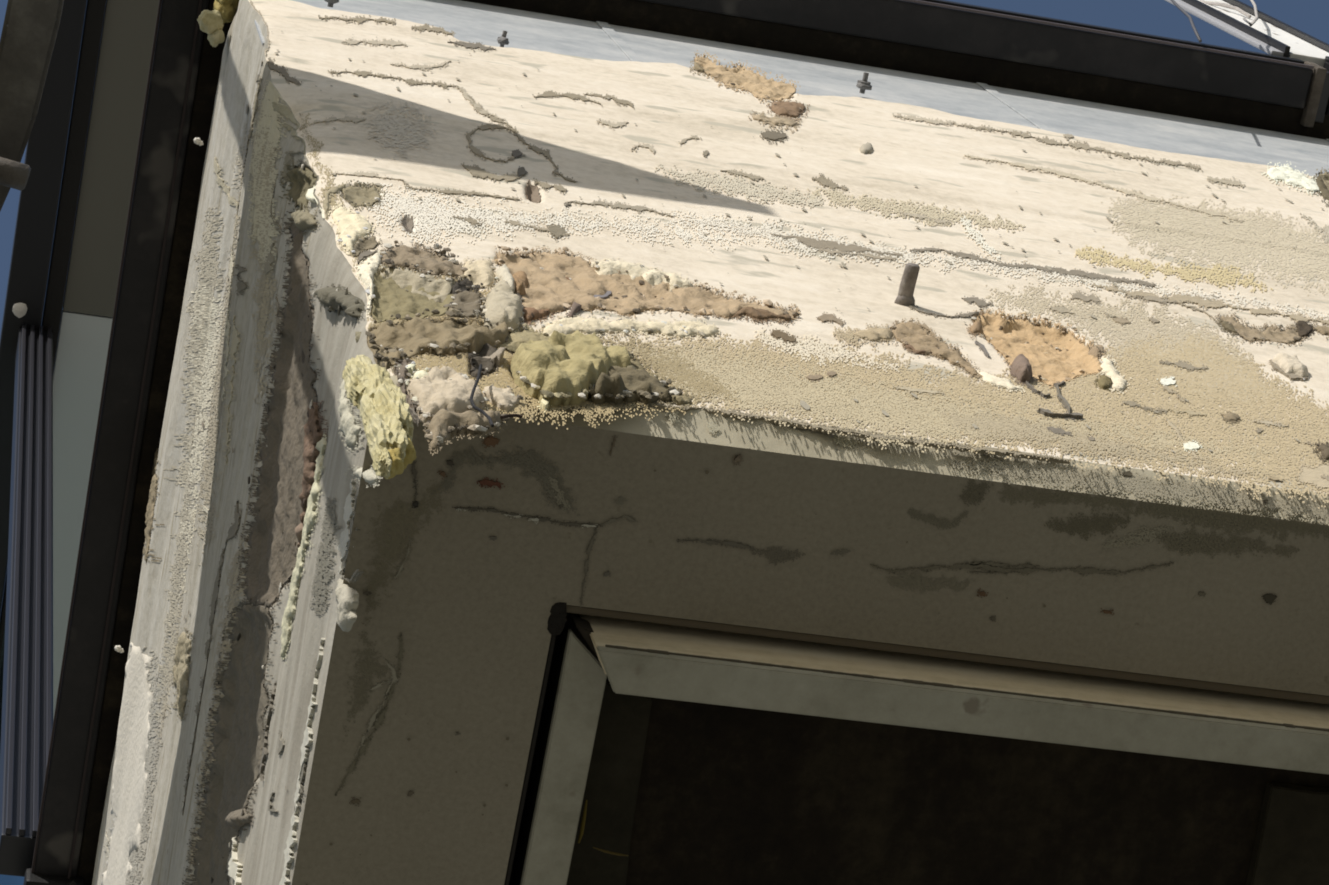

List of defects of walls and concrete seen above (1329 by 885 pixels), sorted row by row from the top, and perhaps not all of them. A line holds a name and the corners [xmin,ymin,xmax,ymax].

crack [532,90,702,153]
spalling [690,50,810,144]
crack [213,0,672,401]
crack [720,169,765,181]
peeling [1261,161,1329,206]
spalling [848,308,1132,394]
spalling [1215,311,1329,347]
spalling [182,80,801,885]
crack [452,506,638,608]
crack [870,560,1174,577]
spalling [170,627,195,725]
crack [182,500,241,818]